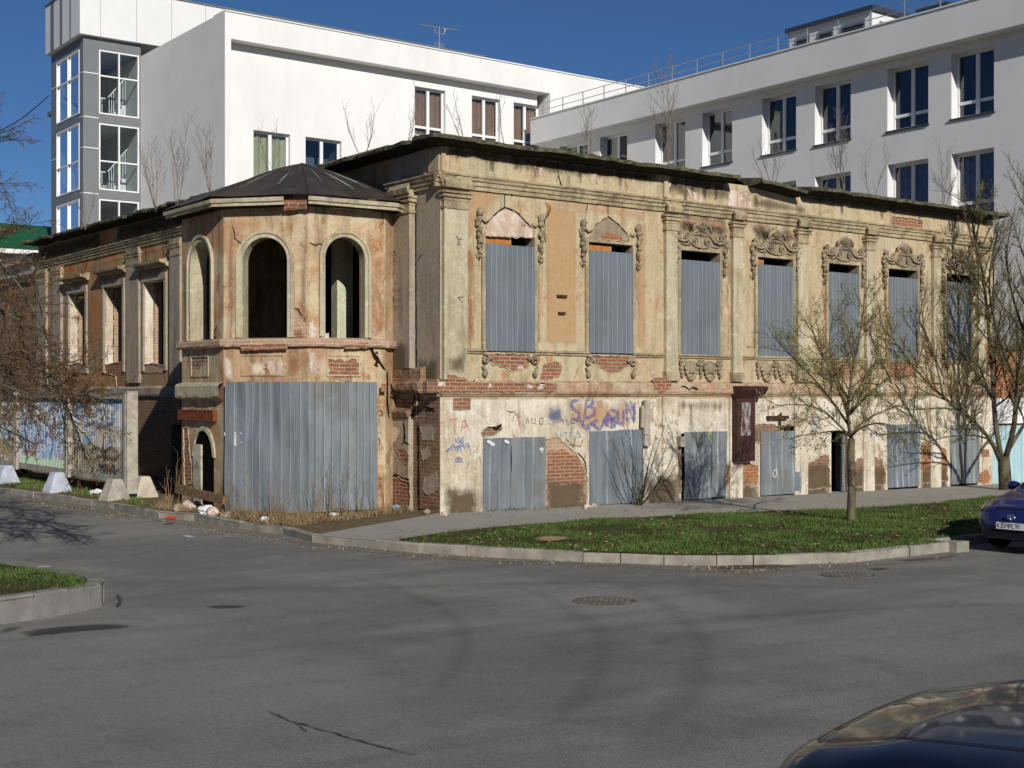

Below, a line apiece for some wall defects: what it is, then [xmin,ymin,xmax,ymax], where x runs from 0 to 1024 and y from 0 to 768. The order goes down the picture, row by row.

flaking render [890,216,923,229]
flaking render [241,306,369,382]
flaking render [591,354,631,374]
flaking render [378,352,562,509]
flaking render [545,436,588,508]
flaking render [743,463,759,486]
water stain [808,466,828,494]
flaking render [921,442,949,484]
water stain [447,490,475,513]